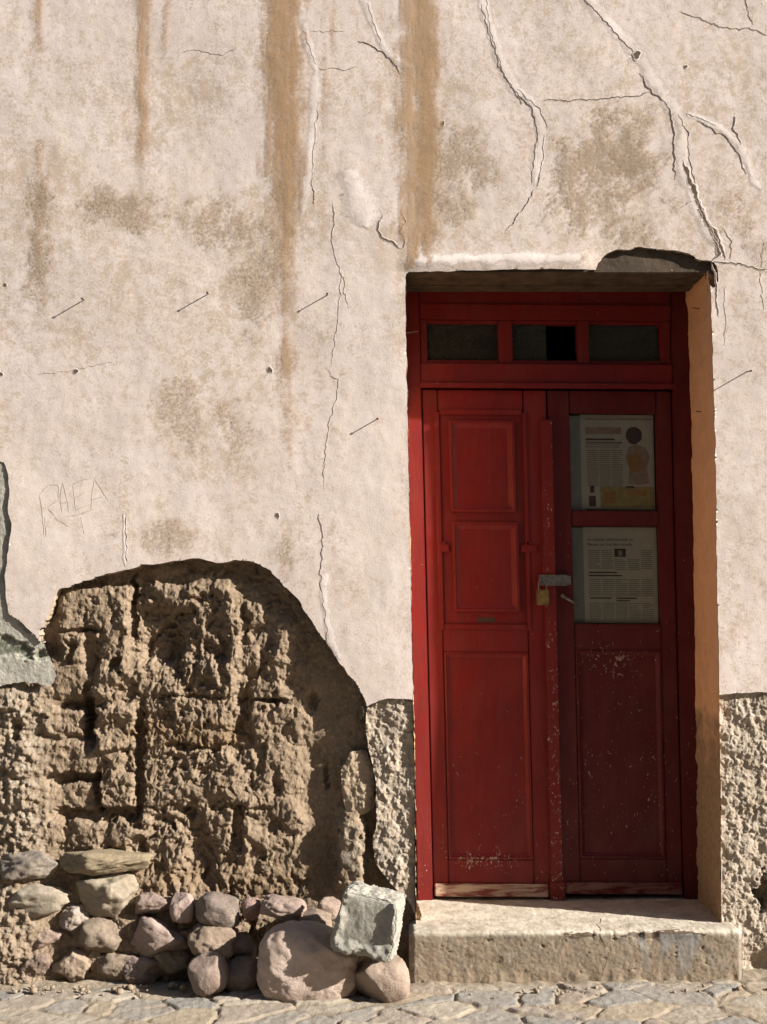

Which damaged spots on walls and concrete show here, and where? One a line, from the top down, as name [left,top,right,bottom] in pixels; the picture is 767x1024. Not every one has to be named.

water stain [78,0,306,381]
crack [297,0,413,480]
water stain [394,0,500,269]
crack [478,0,767,344]
spalling [605,247,718,293]
spalling [0,462,422,986]
crack [318,515,341,660]